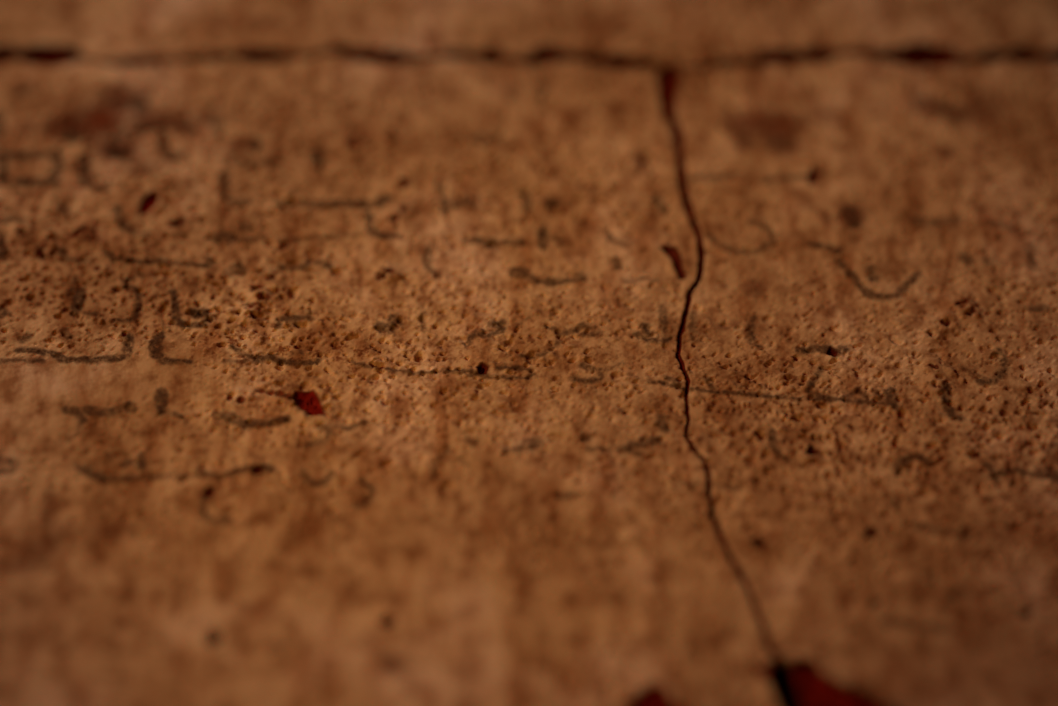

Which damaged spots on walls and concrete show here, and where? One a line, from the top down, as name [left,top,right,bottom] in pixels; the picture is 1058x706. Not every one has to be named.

crack [0,44,155,67]
crack [185,42,1058,706]